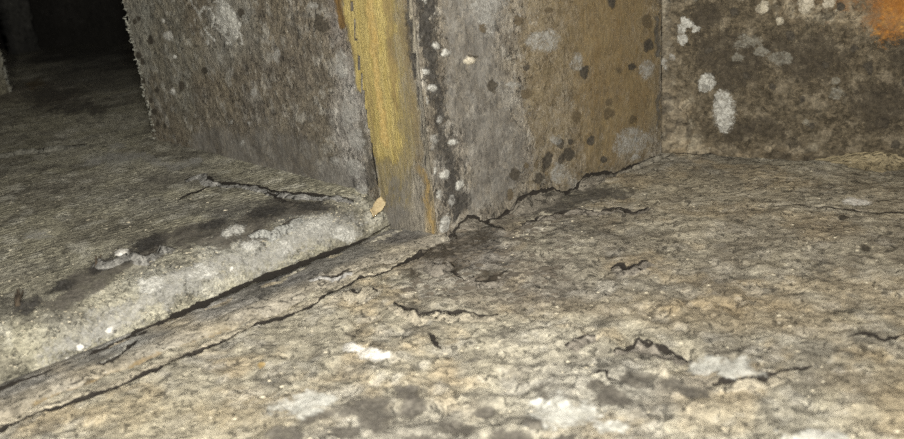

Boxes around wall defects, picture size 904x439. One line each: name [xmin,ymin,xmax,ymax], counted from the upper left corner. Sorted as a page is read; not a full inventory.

rust [869,0,904,45]
water stain [404,0,471,224]
water stain [487,79,531,99]
water stain [571,55,589,79]
water stain [615,0,904,158]
crack [0,144,87,158]
water stain [508,137,575,199]
water stain [527,185,636,214]
water stain [423,227,492,273]
crack [0,152,716,432]